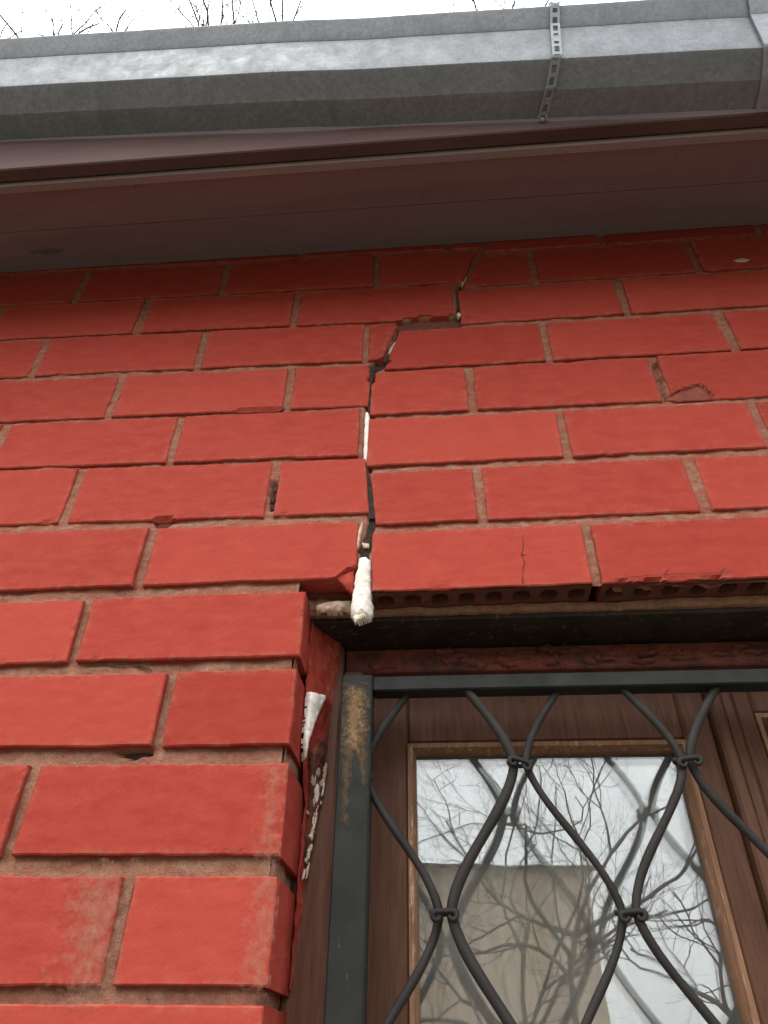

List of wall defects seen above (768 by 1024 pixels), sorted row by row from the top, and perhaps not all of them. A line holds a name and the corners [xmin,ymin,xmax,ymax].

crack [456,249,479,320]
crack [368,333,399,413]
crack [357,465,376,568]
spalling [301,736,328,879]